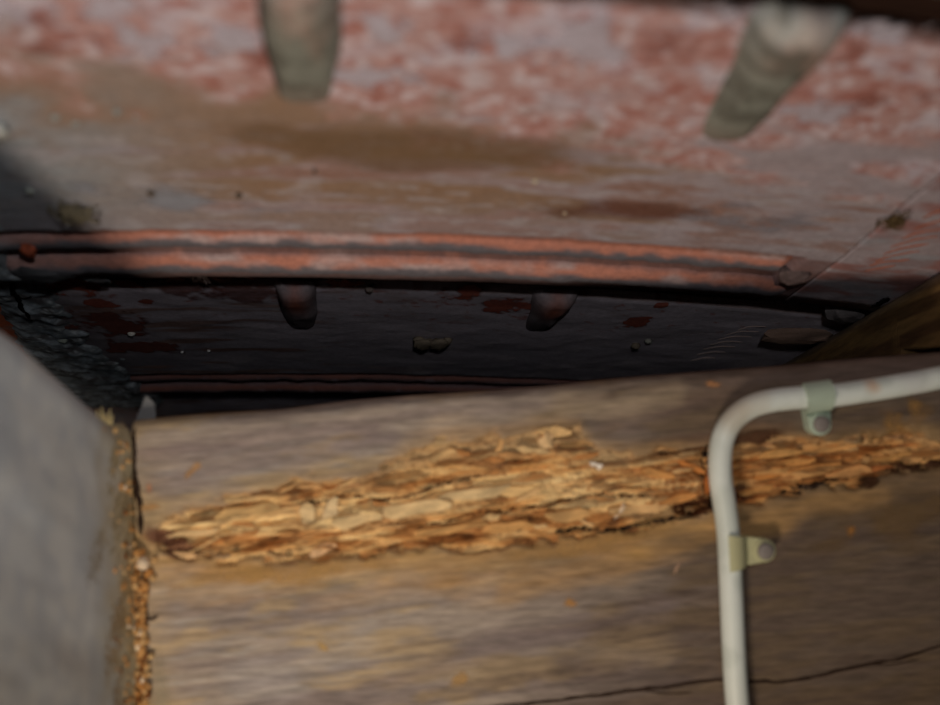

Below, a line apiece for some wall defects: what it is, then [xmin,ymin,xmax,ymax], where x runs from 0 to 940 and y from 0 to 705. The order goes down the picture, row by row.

peeling [481,425,603,470]
peeling [757,445,912,478]
peeling [167,478,544,559]
peeling [413,461,710,536]
crack [747,645,940,684]
crack [501,678,724,705]